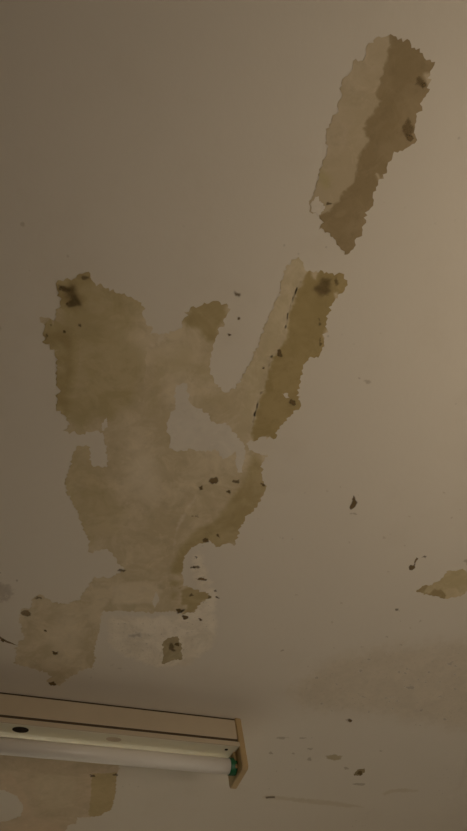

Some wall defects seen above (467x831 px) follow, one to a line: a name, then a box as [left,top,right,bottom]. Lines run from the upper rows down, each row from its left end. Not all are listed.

peeling [309,34,435,255]
peeling [14,257,348,686]
peeling [416,559,467,599]
peeling [0,755,120,831]